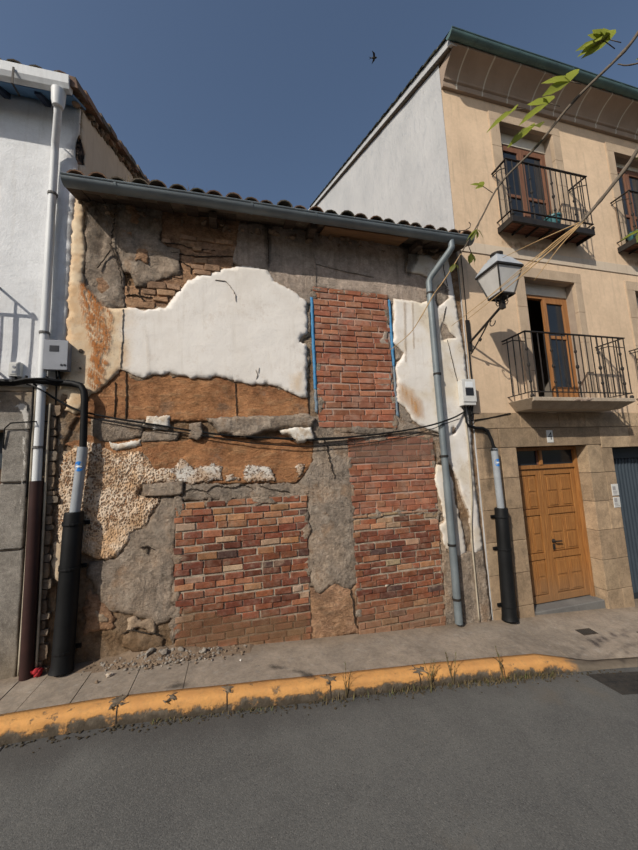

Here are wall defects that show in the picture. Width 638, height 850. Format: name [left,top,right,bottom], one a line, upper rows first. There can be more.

crack [97,213,124,289]
peeling [46,199,311,431]
peeling [378,254,484,556]
peeling [51,427,314,581]
spalling [127,616,157,634]
spalling [309,584,359,639]